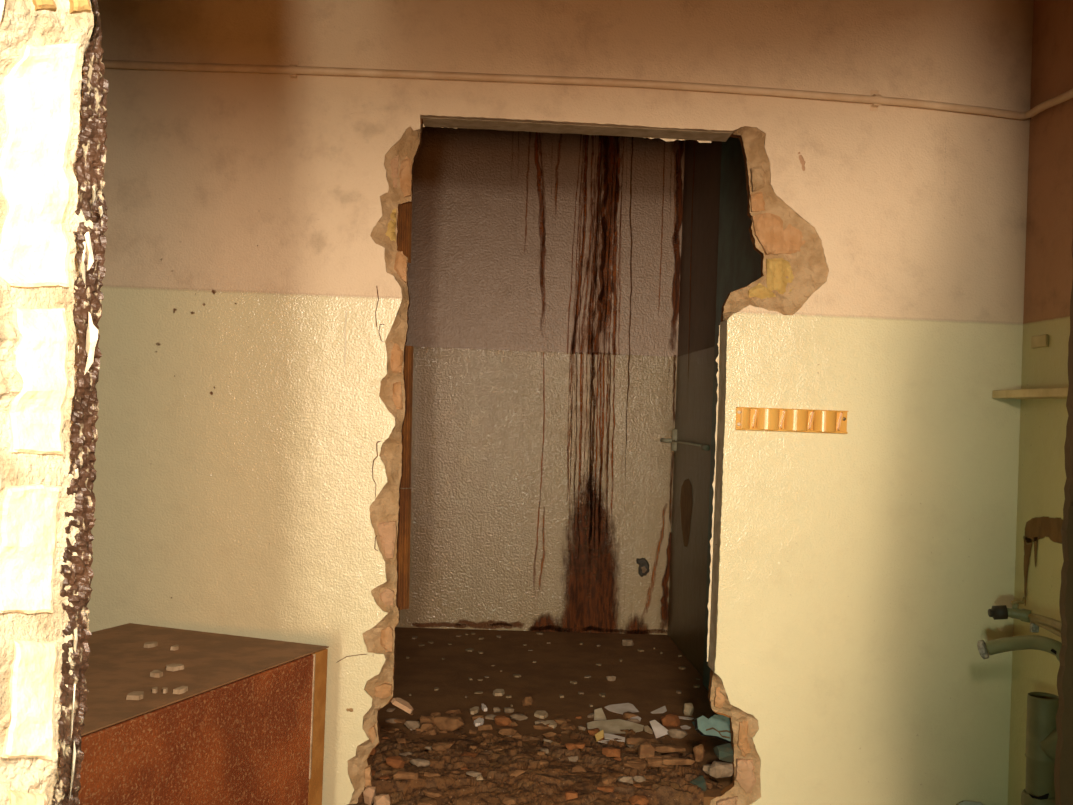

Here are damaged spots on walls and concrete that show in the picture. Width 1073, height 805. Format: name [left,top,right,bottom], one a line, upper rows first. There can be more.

spalling [0,0,109,805]
peeling [126,664,188,700]
flaking render [346,118,426,804]
corrosion [525,132,562,317]
corrosion [531,134,674,634]
hole [636,558,650,577]
corrosion [659,140,684,421]
flaking render [707,126,829,805]